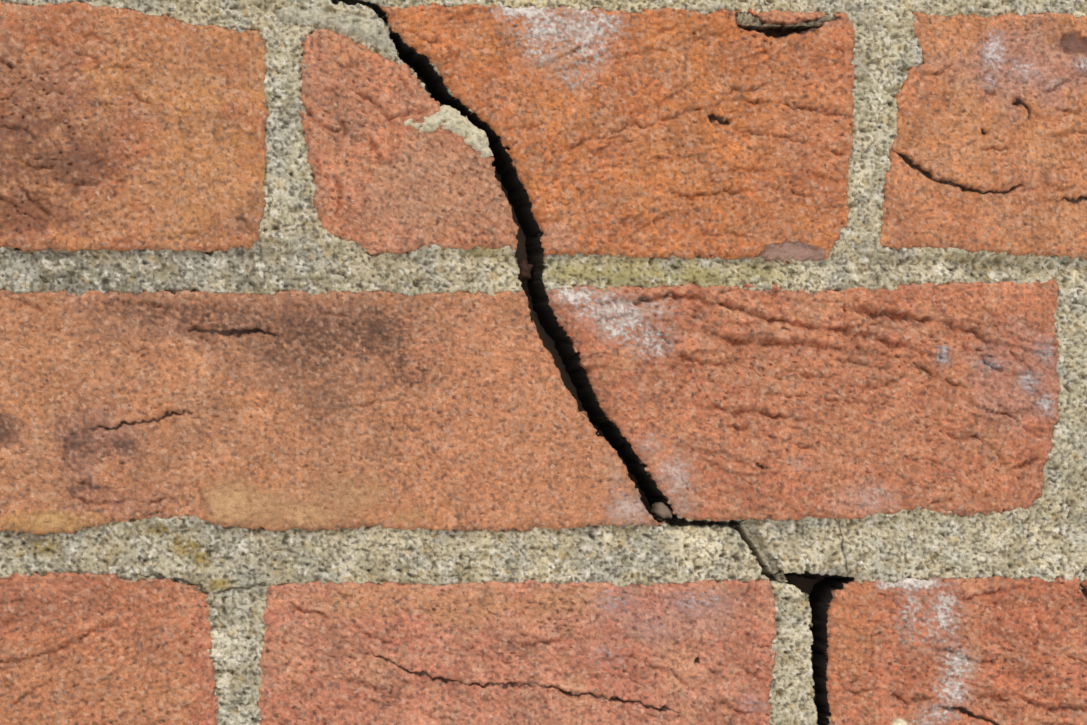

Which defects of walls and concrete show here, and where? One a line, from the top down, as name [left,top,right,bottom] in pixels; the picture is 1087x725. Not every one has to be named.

crack [332,0,855,725]